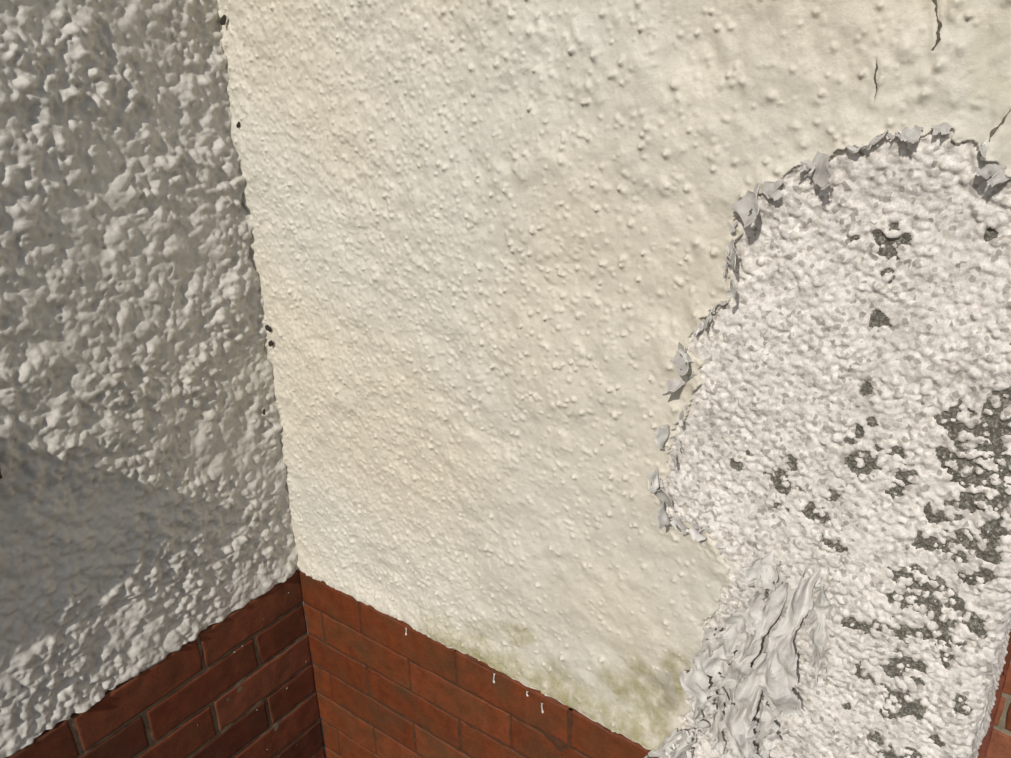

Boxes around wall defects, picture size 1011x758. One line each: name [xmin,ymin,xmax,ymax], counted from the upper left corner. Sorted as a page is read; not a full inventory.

crack [931,0,942,50]
crack [871,59,879,96]
crack [989,109,1011,142]
peeling [645,122,1011,758]